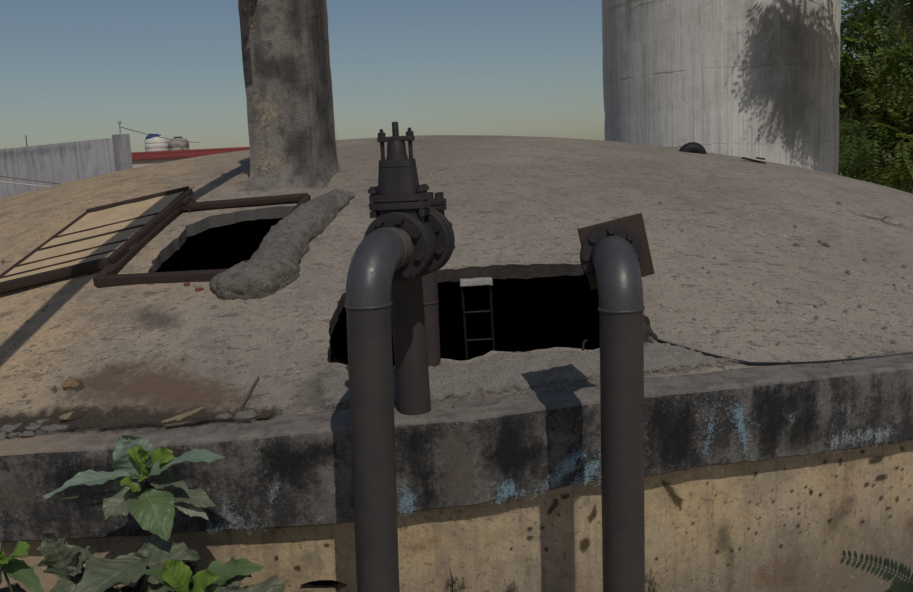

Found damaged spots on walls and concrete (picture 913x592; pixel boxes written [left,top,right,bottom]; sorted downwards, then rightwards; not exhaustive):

damp [485,421,550,475]
damp [753,385,818,456]
damp [830,427,889,450]
damp [44,460,160,510]